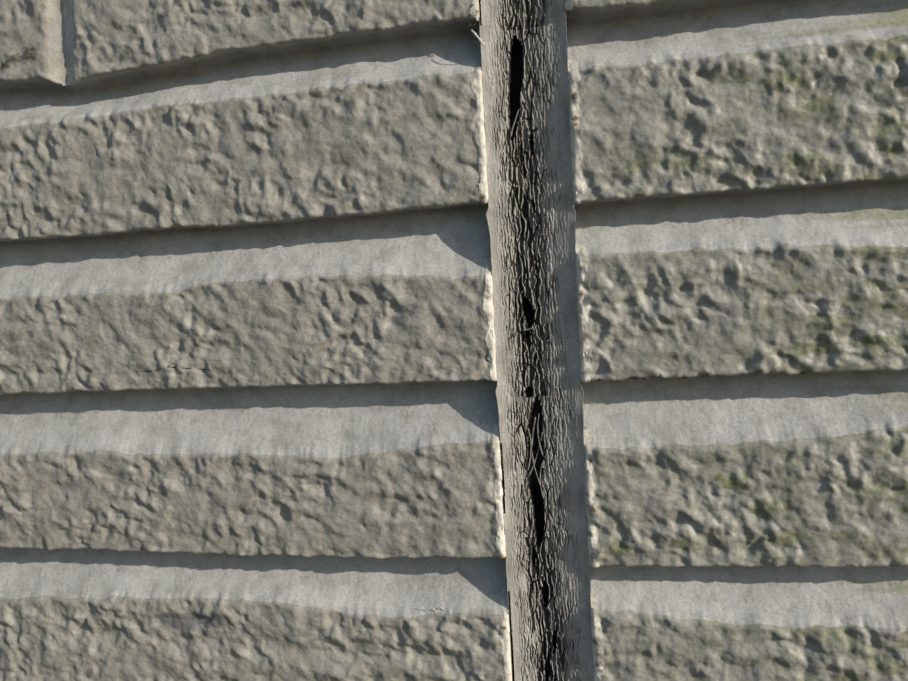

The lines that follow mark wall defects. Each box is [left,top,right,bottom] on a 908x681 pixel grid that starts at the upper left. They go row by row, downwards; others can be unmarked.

crack [478,0,586,681]